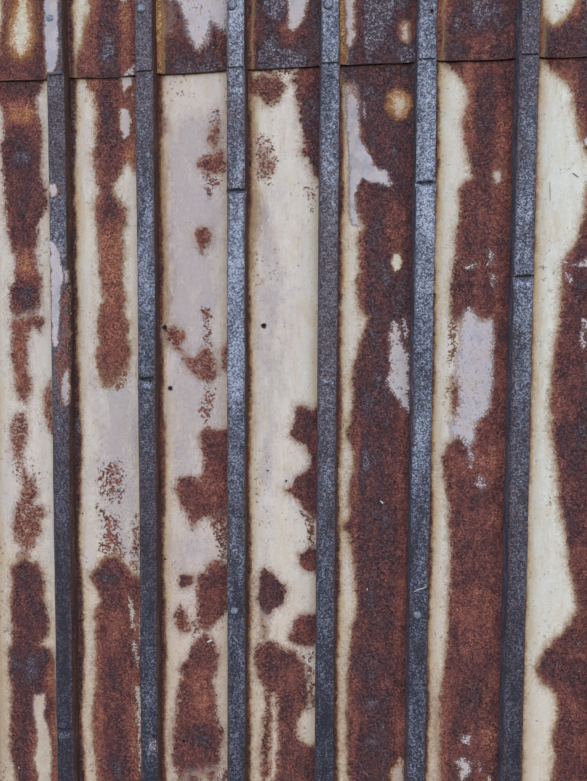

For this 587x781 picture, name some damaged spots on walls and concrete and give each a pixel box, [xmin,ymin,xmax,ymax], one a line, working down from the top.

corrosion [0,0,141,781]
corrosion [156,0,227,781]
corrosion [247,0,321,781]
corrosion [334,0,417,781]
corrosion [425,0,517,781]
corrosion [523,186,587,781]
corrosion [538,0,587,154]